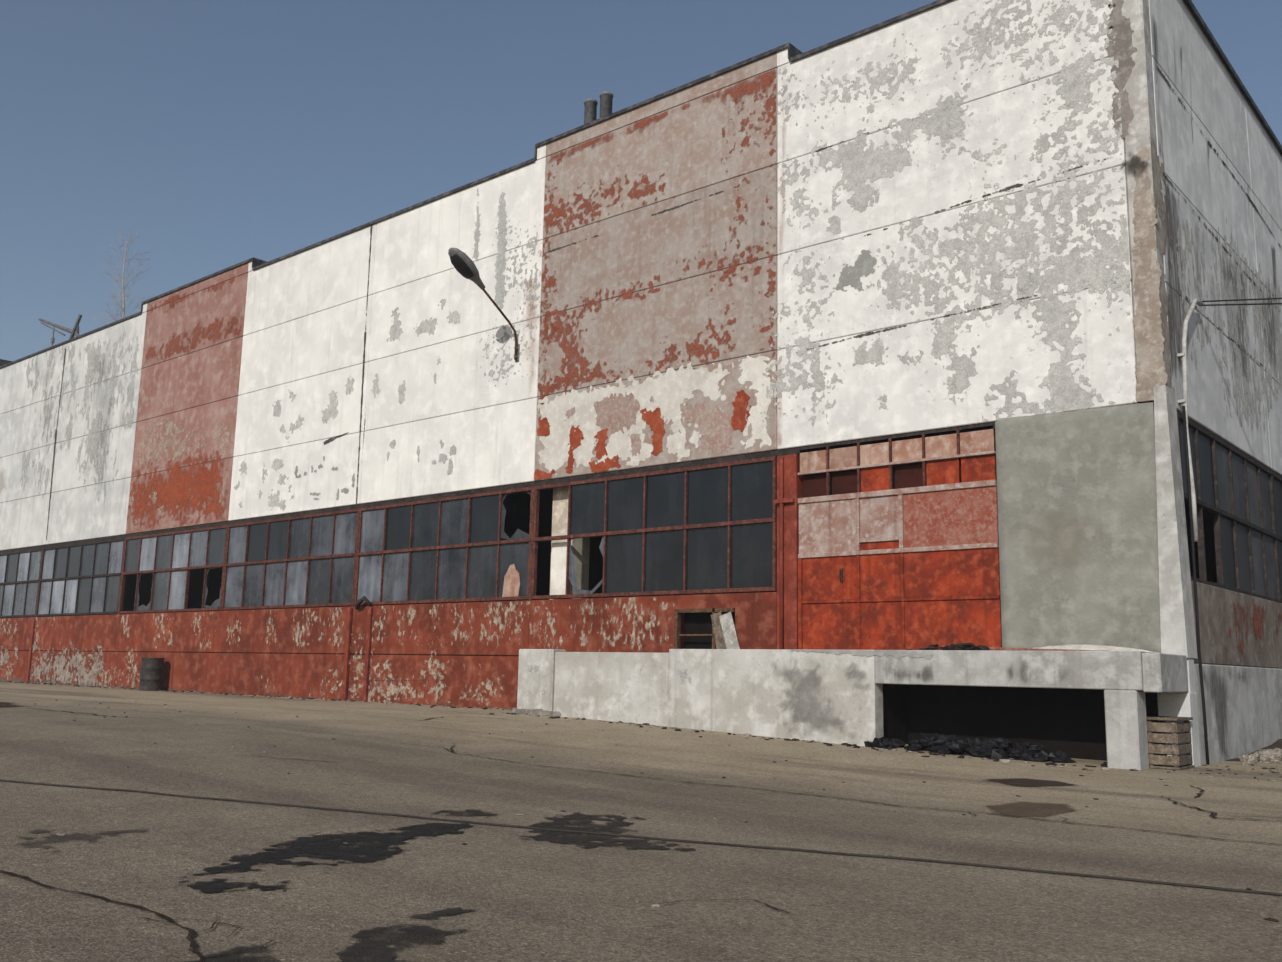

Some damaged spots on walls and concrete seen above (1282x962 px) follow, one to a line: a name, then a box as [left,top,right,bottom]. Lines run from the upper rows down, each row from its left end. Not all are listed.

peeling [387,299,460,342]
peeling [473,0,1282,480]
damp [1166,188,1184,370]
damp [1223,264,1247,379]
damp [1262,249,1276,369]
peeling [21,317,338,527]
peeling [322,377,355,424]
peeling [398,380,406,404]
peeling [416,440,456,475]
peeling [0,615,140,688]
peeling [193,612,241,649]
peeling [293,597,675,708]